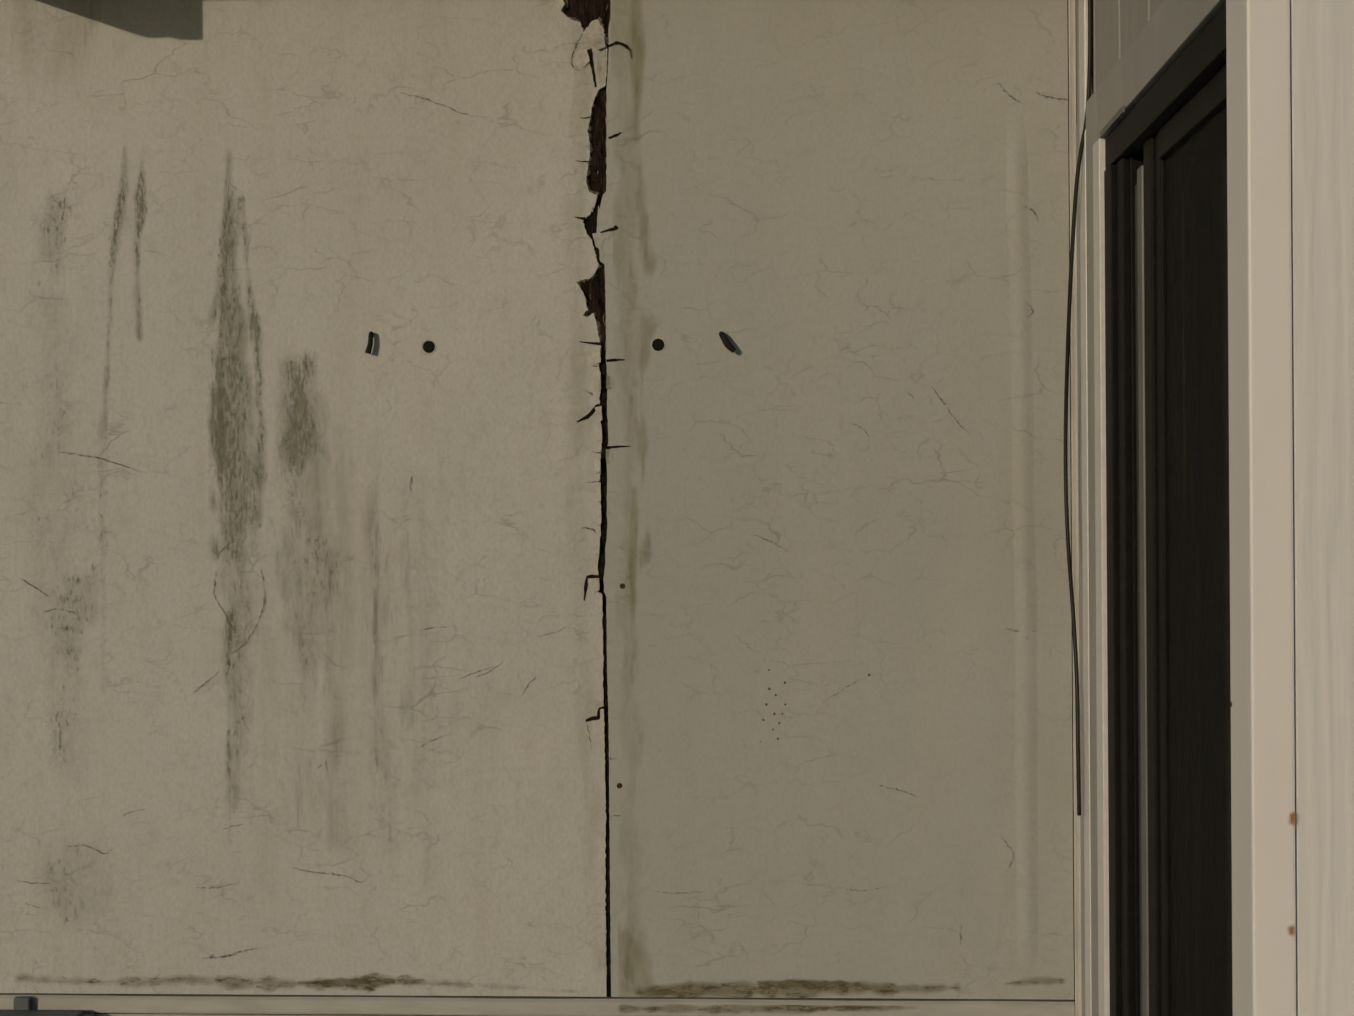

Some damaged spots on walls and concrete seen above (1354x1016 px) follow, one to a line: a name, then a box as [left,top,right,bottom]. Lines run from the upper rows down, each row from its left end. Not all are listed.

peeling [571,24,633,87]
crack [579,116,622,162]
damp [111,173,145,264]
crack [575,206,618,261]
damp [210,182,263,561]
damp [282,357,316,471]
crack [577,341,630,974]
damp [306,979,394,987]